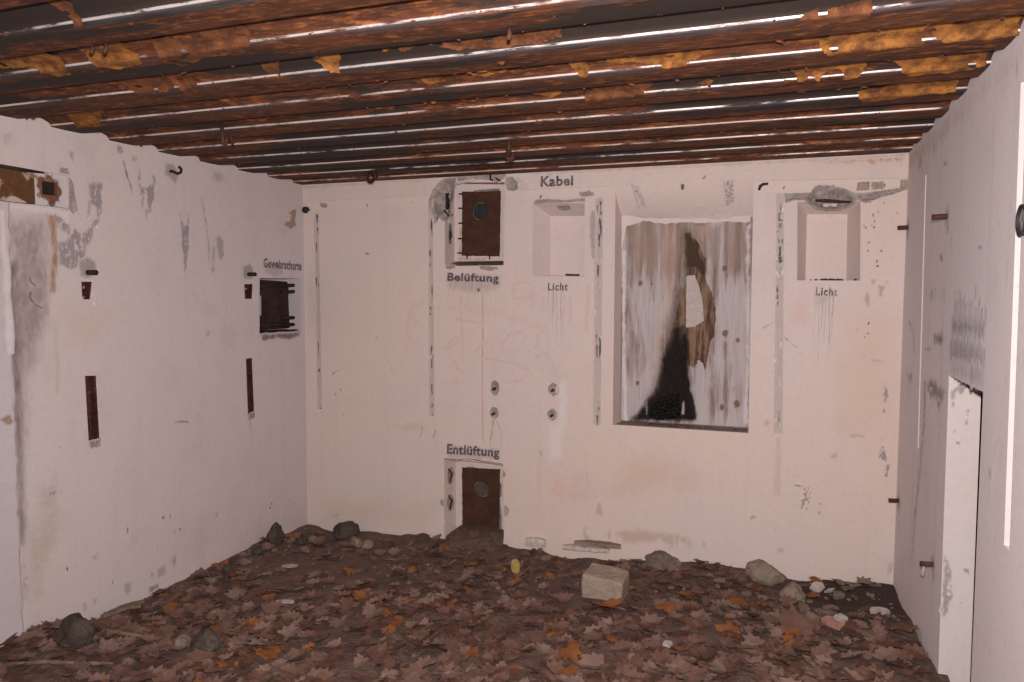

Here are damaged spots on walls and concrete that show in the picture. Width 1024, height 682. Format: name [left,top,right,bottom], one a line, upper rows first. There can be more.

rust [0,52,72,77]
rust [78,24,250,94]
rust [312,53,341,73]
rust [790,0,1021,102]
peeling [54,150,104,270]
spalling [781,185,907,220]